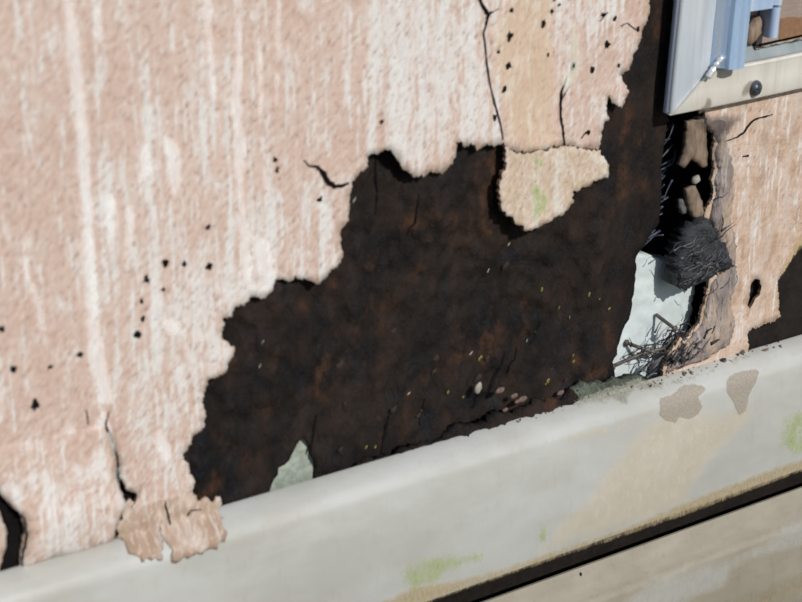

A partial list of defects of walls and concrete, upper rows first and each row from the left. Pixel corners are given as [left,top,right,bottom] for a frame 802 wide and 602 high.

crack [479,0,504,140]
crack [560,77,589,146]
crack [726,114,773,141]
crack [304,160,350,189]
peeling [496,145,609,231]
crack [0,495,23,571]